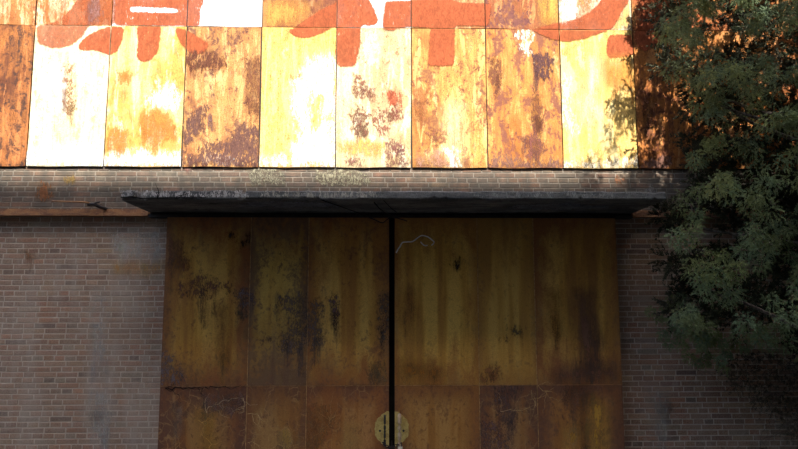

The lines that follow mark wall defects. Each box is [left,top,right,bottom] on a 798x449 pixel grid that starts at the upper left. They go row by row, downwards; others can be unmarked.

rust [615,4,630,29]
rust [61,64,77,115]
rust [107,126,128,157]
rust [140,109,175,156]
rust [182,56,262,167]
peeling [260,53,336,167]
rust [339,75,447,167]
rust [488,58,503,89]
rust [532,52,555,84]
rust [260,291,340,374]
crack [165,381,295,449]